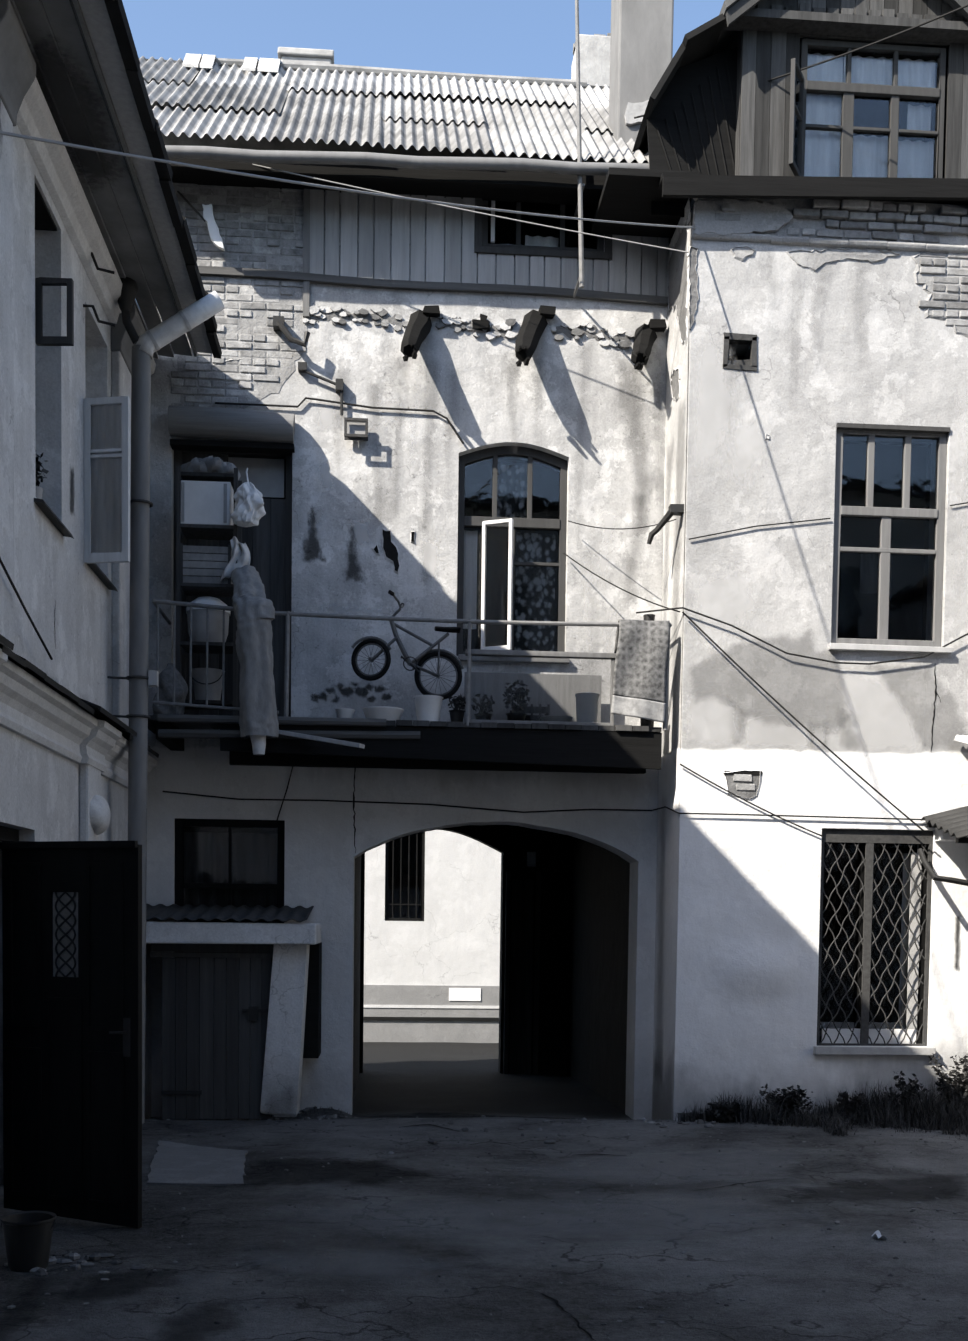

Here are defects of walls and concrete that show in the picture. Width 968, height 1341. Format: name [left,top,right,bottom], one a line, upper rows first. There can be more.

spalling [729,245,756,262]
spalling [785,243,968,338]
damp [303,508,324,561]
damp [347,529,360,580]
crack [931,670,941,750]